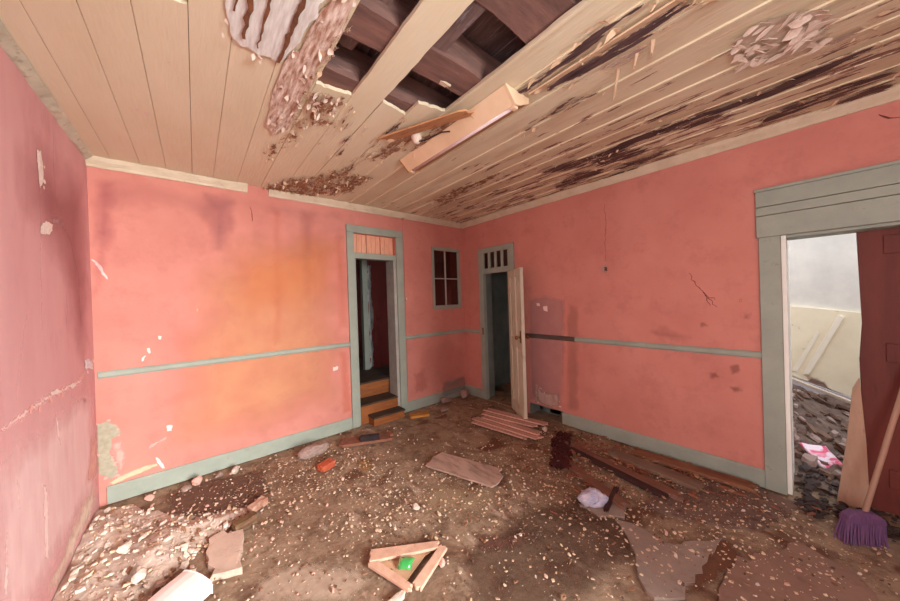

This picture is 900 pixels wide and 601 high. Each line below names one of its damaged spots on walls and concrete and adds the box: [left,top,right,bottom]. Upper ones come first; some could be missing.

peeling [222,0,456,197]
peeling [518,0,900,191]
peeling [37,150,46,189]
peeling [41,219,59,235]
flaking render [88,419,173,484]